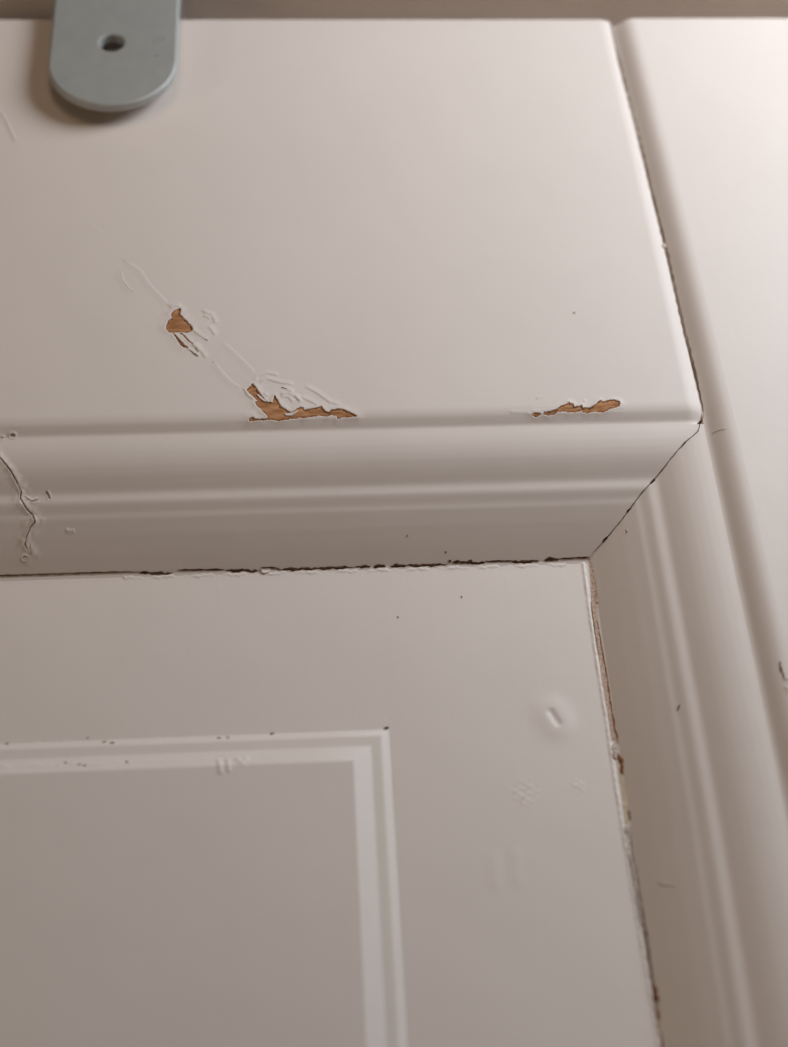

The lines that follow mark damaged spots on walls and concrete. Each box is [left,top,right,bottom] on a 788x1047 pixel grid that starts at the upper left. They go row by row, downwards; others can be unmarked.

peeling [156,300,223,359]
peeling [236,368,367,430]
peeling [509,394,628,423]
crack [0,430,175,581]
crack [180,19,704,1047]